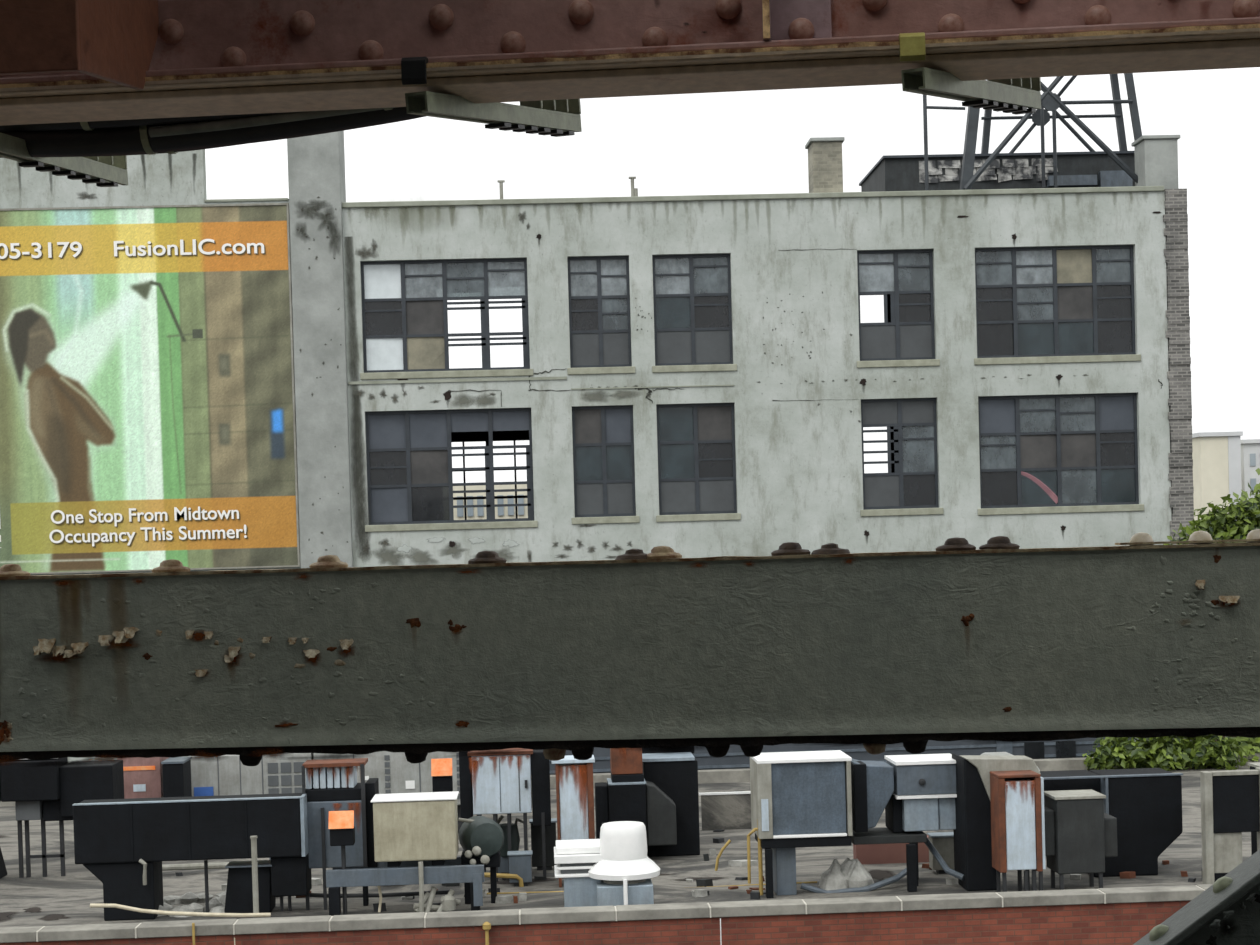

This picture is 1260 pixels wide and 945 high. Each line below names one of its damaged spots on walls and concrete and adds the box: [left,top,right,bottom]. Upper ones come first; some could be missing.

water stain [297,197,368,556]
corrosion [406,618,421,628]
corrosion [448,619,467,633]
corrosion [0,720,15,765]
corrosion [36,756,126,766]
corrosion [190,752,221,760]
corrosion [255,750,359,760]
corrosion [459,750,530,784]